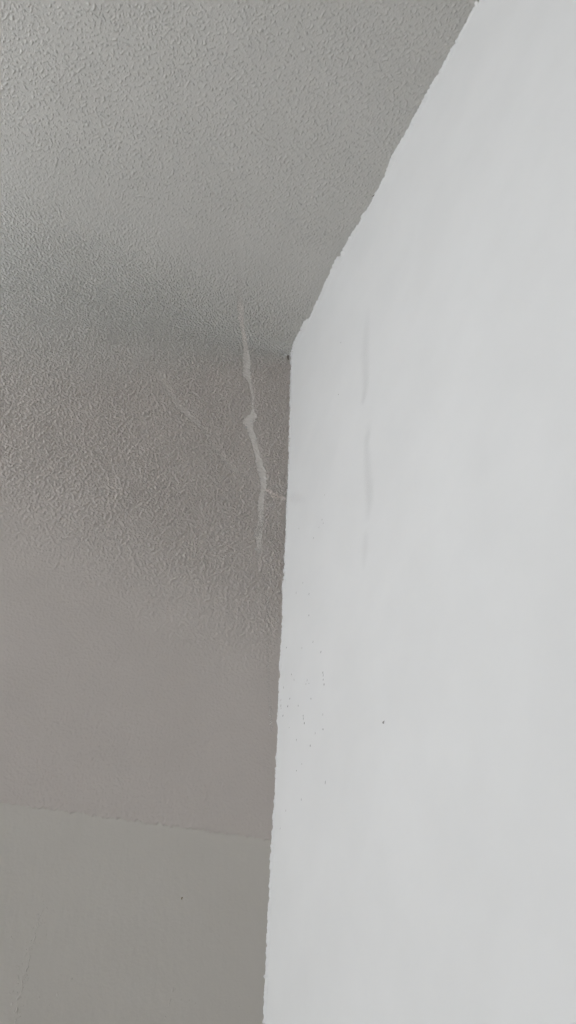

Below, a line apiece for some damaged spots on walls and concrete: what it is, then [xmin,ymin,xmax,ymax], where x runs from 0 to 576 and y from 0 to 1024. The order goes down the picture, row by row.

crack [237,271,286,728]